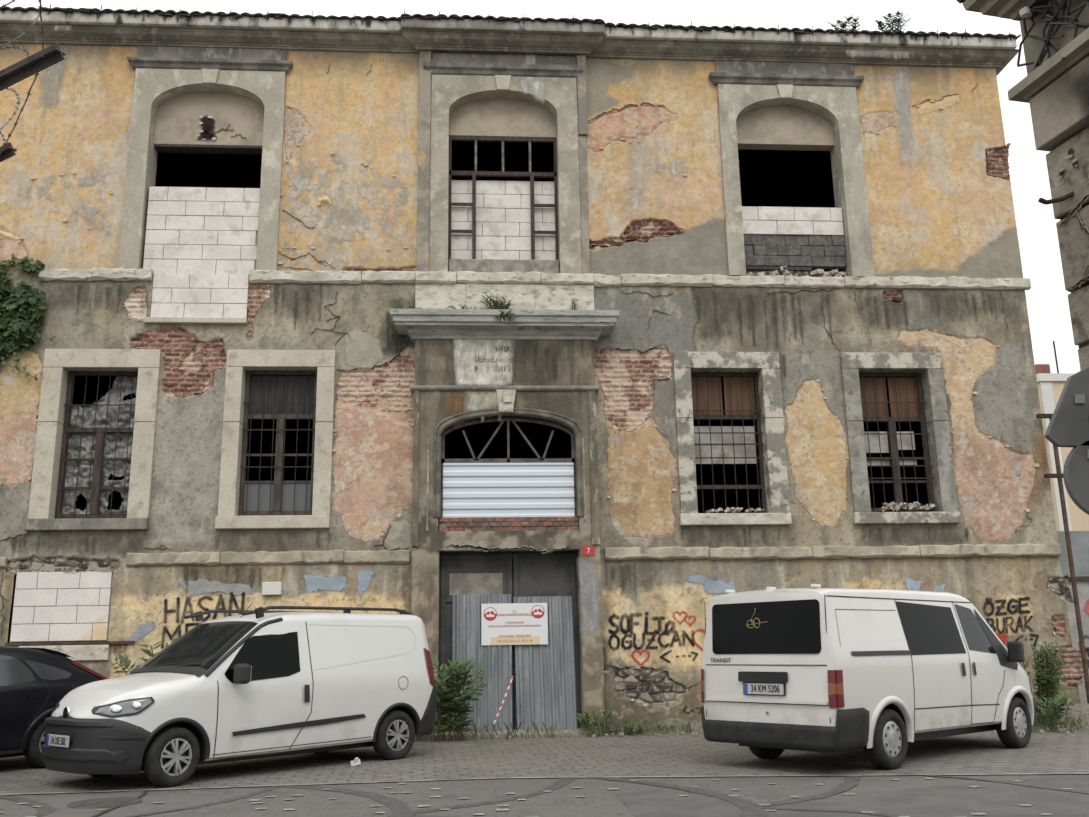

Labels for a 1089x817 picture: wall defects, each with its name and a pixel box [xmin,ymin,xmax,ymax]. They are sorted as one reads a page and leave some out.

spalling [128,327,227,397]
spalling [245,283,271,339]
crack [280,210,411,373]
spalling [589,147,687,247]
water stain [704,292,803,342]
spalling [986,143,1011,179]
crack [1057,194,1089,292]
flaking render [331,347,415,542]
flaking render [594,345,679,538]
flaking render [784,379,849,527]
flaking render [897,329,1040,543]
spalling [603,666,688,709]